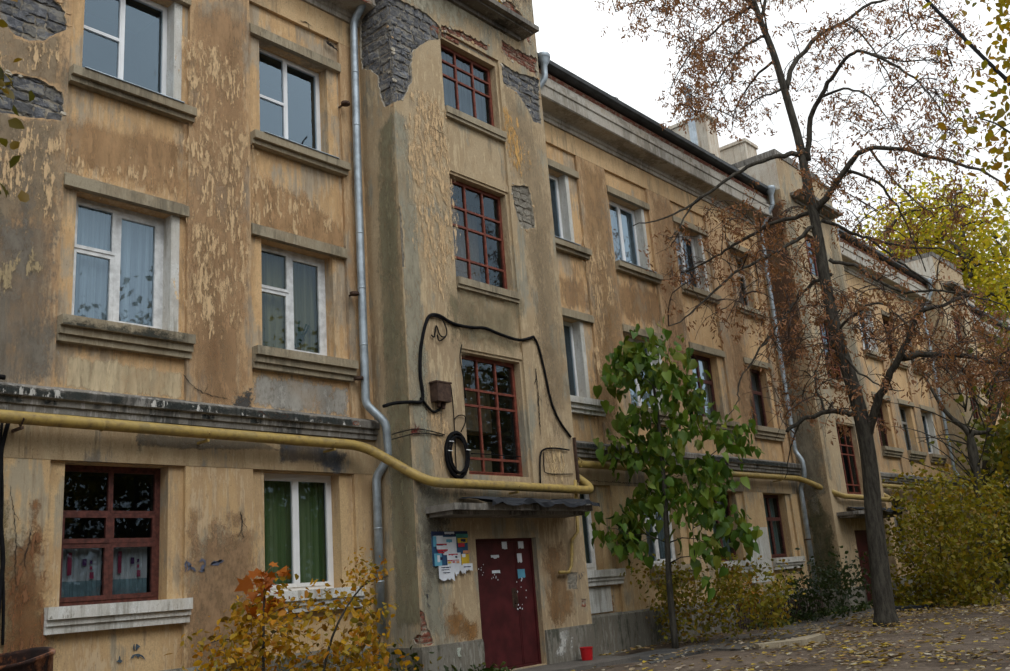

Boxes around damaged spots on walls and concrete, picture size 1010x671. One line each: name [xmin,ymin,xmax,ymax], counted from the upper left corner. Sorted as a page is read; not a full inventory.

peeling [0,0,332,342]
spalling [358,0,542,301]
water stain [0,503,29,654]
spalling [414,611,433,646]